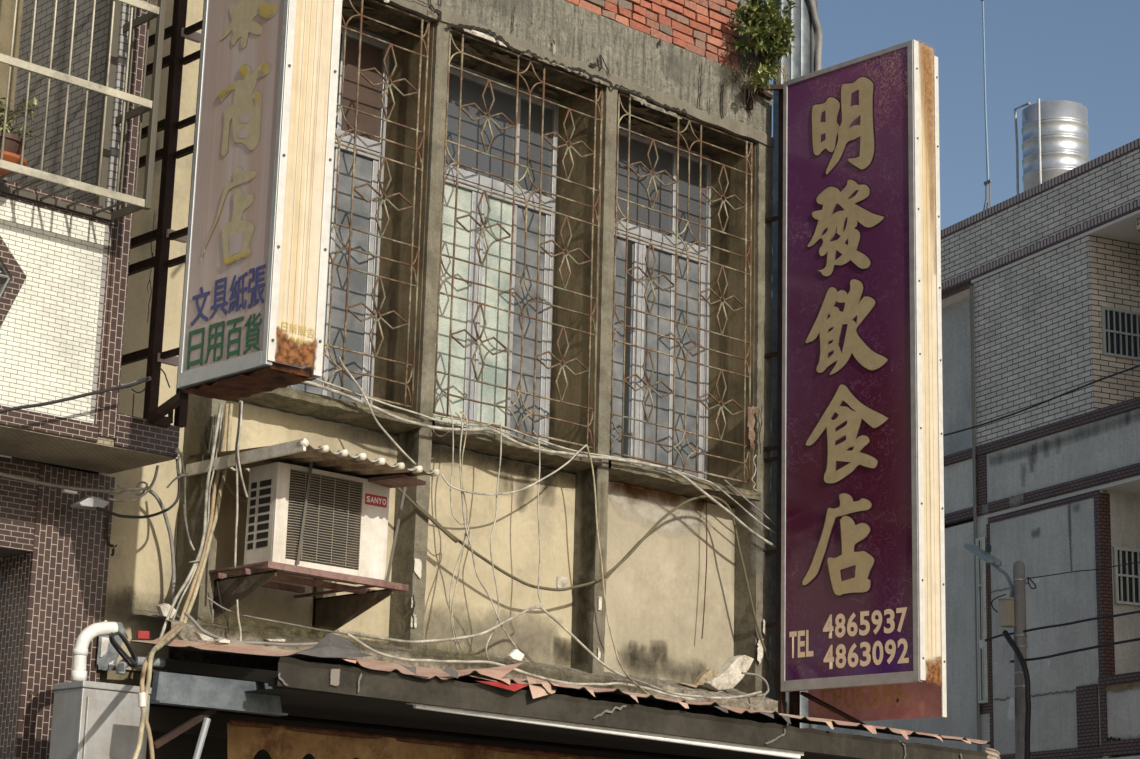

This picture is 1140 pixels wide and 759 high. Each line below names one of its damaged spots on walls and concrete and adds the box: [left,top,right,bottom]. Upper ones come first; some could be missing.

damp [699,63,742,118]
damp [625,646,702,680]